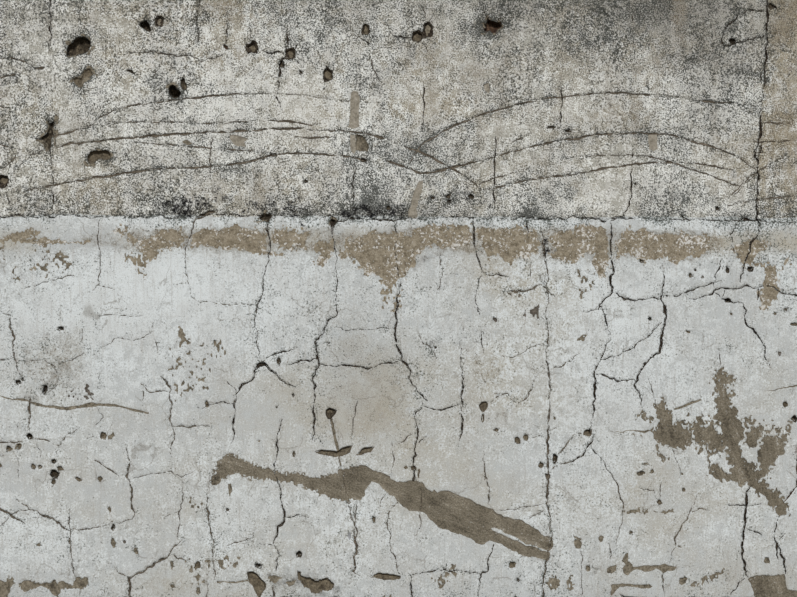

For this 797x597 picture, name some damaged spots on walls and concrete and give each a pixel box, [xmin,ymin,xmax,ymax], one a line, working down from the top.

crack [0,145,505,535]
peeling [113,181,711,312]
crack [484,0,797,597]
peeling [0,575,89,597]
crack [0,446,190,596]
crack [205,419,309,597]
flaking render [217,570,334,597]
crack [341,466,360,576]
peeling [209,408,553,568]
crack [380,494,494,597]
peeling [611,367,793,517]
peeling [748,574,797,597]